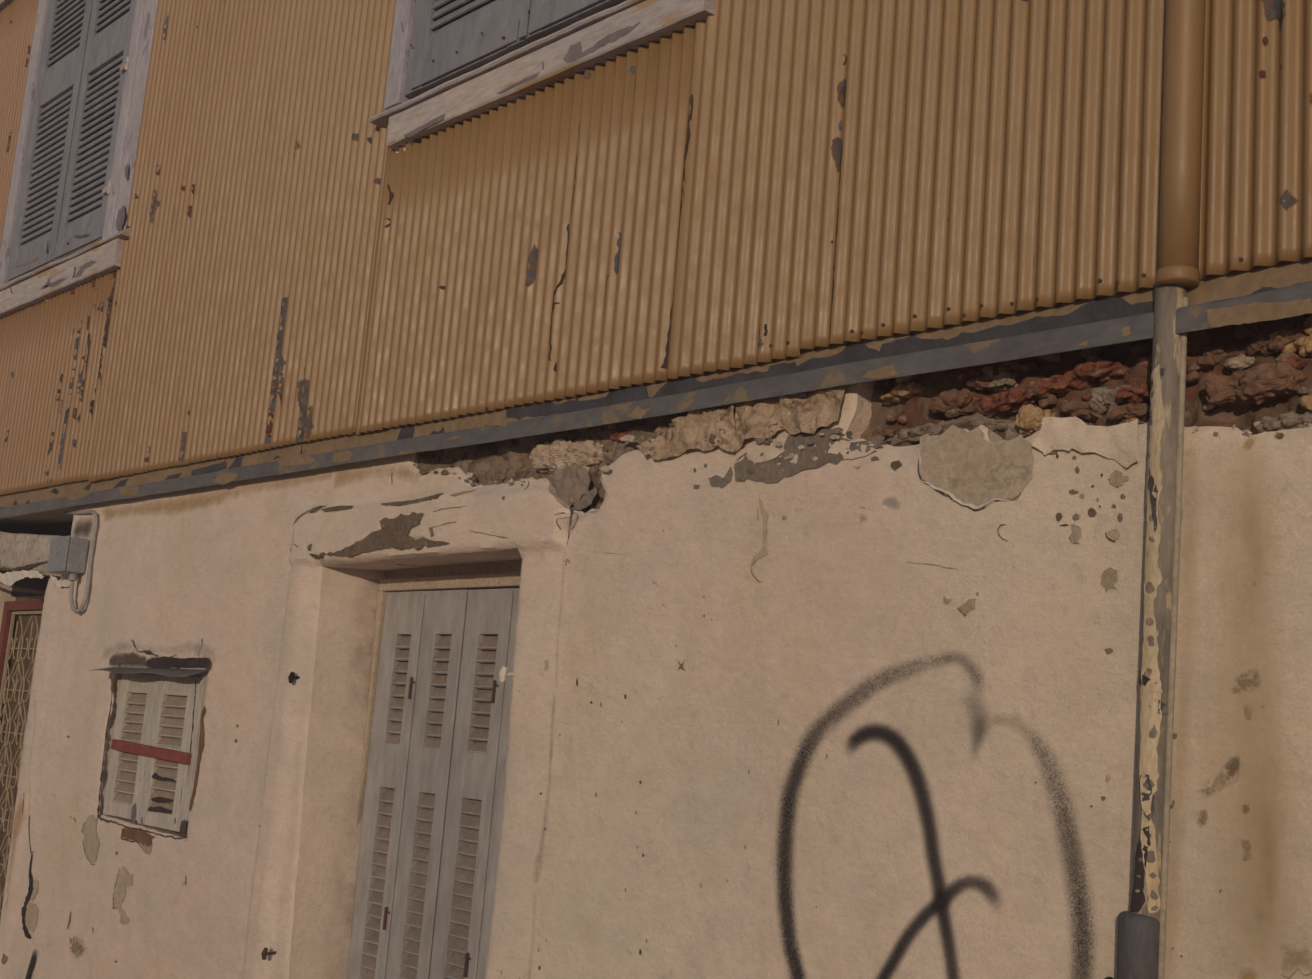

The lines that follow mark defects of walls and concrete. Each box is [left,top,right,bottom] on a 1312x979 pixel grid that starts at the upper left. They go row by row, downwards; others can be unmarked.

peeling [1262,0,1286,31]
peeling [604,232,622,303]
peeling [40,260,104,494]
peeling [265,297,315,459]
spalling [1184,313,1312,438]
peeling [165,411,242,485]
peeling [151,681,196,781]
crack [1,793,39,965]
peeling [69,814,100,865]
peeling [113,797,176,925]
peeling [67,912,93,956]